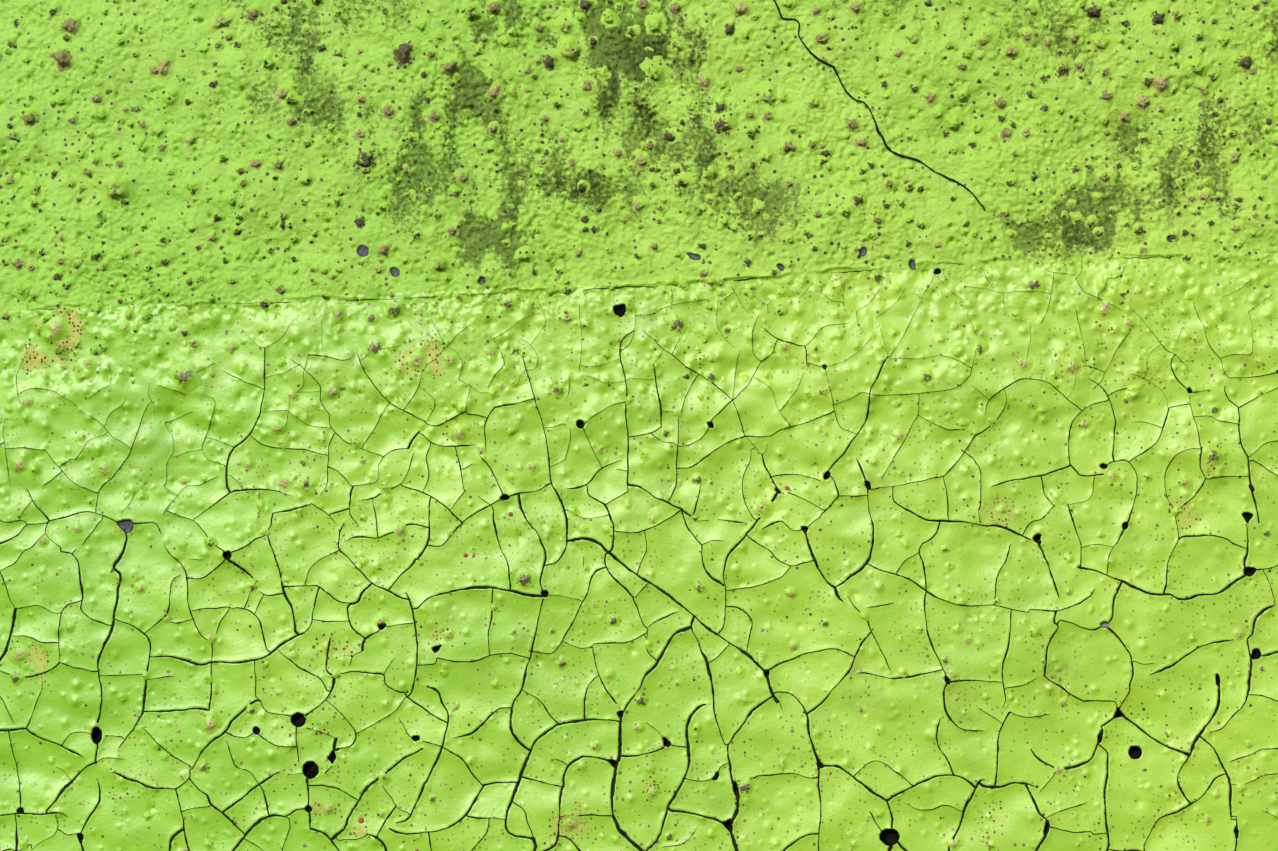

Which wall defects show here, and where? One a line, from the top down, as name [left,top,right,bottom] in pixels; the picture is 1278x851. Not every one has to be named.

crack [773,0,985,211]
crack [0,256,1278,851]